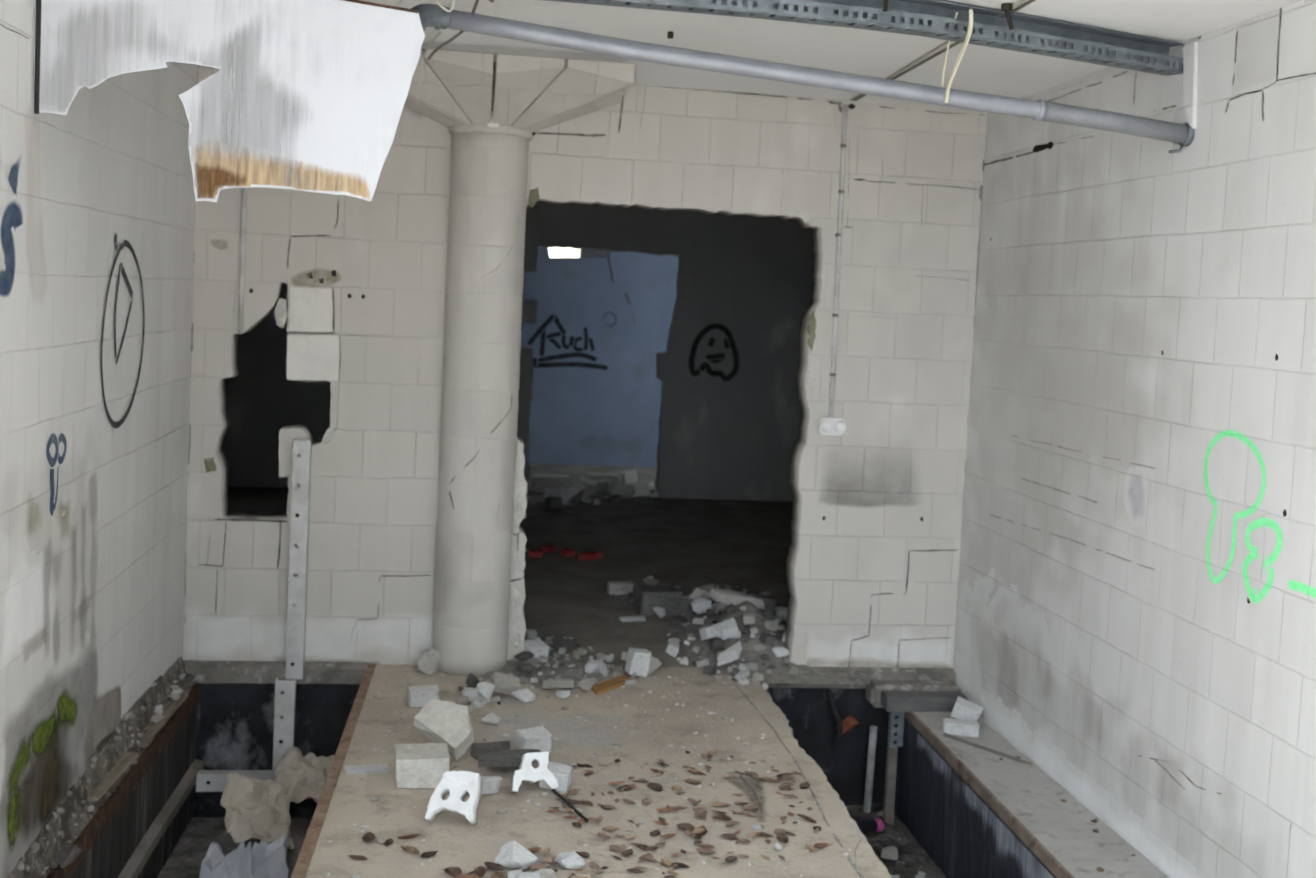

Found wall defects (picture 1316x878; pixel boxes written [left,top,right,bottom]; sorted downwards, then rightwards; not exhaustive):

spalling [793,210,813,224]
peeling [275,298,288,328]
spalling [807,311,816,396]
spalling [322,428,335,445]
damp [0,396,121,878]
spalling [510,486,526,648]
crack [848,550,957,668]
spalling [69,703,261,878]
spalling [289,817,313,834]